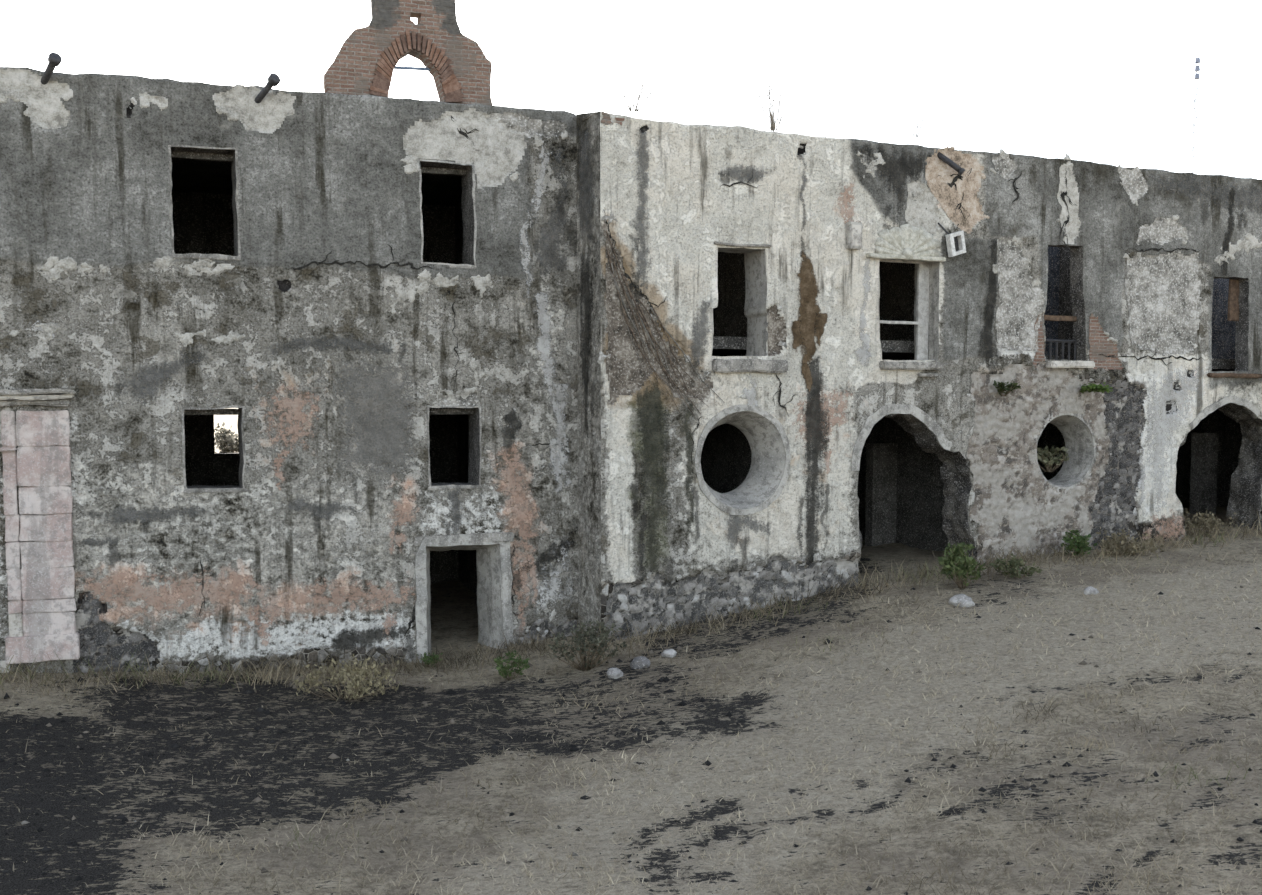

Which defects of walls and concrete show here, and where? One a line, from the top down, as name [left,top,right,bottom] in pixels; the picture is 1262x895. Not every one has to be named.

flaking render [0,68,73,130]
flaking render [213,84,296,134]
flaking render [400,108,568,189]
water stain [853,144,930,221]
flaking render [905,145,1018,235]
flaking render [1056,154,1081,244]
flaking render [1118,164,1148,206]
water stain [691,300,710,364]
water stain [636,383,670,578]
water stain [683,403,694,532]
water stain [793,357,852,565]